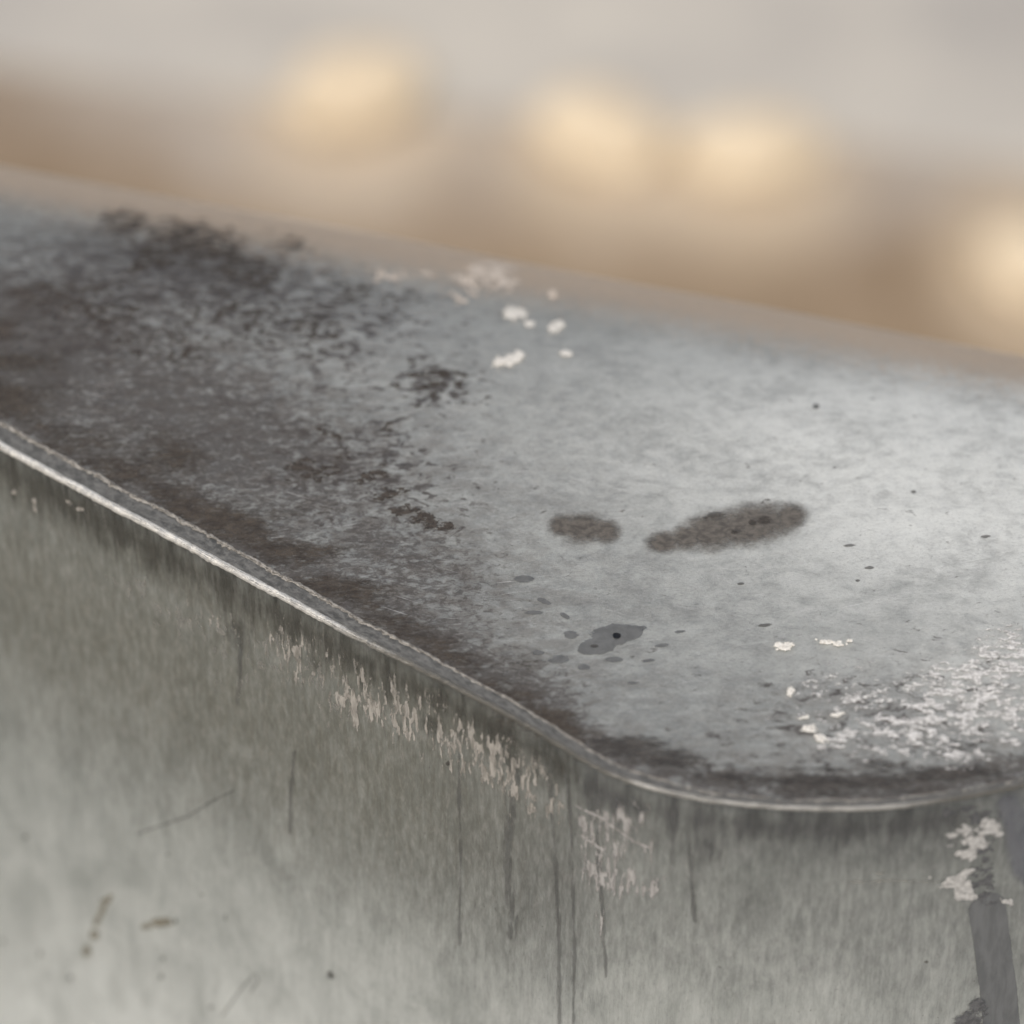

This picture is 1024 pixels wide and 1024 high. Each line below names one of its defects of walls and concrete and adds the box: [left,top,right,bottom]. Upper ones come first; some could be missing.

damp [551,515,619,542]
damp [648,504,806,551]
damp [533,613,646,670]
peeling [774,641,795,651]
peeling [265,624,564,823]
peeling [785,623,1024,769]
peeling [576,804,666,898]
peeling [927,818,1004,903]